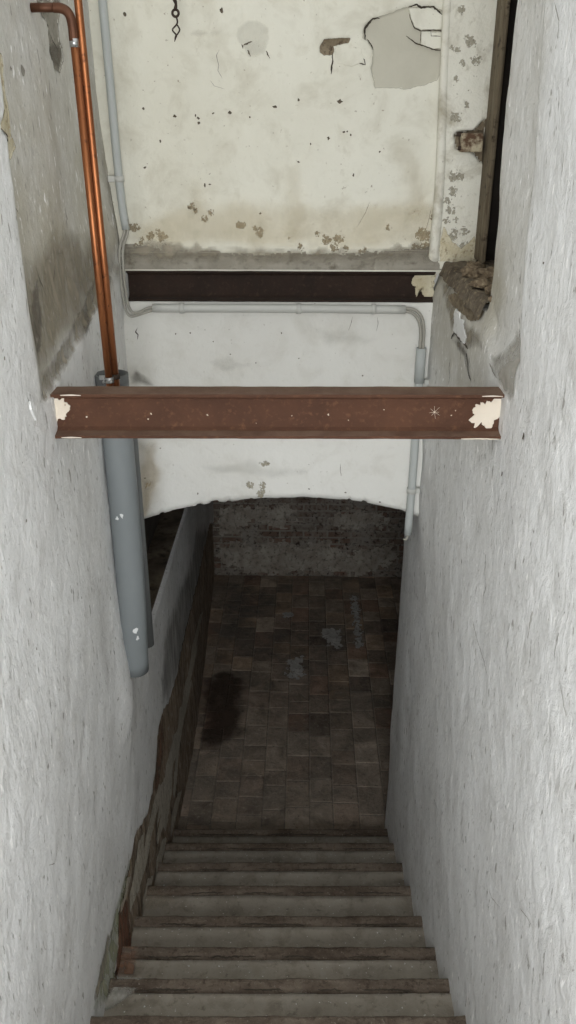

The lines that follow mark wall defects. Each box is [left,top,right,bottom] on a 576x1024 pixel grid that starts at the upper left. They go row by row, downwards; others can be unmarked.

flaking render [320,4,482,89]
leakage [129,244,218,259]
flaking render [448,293,490,321]
leakage [202,673,242,742]